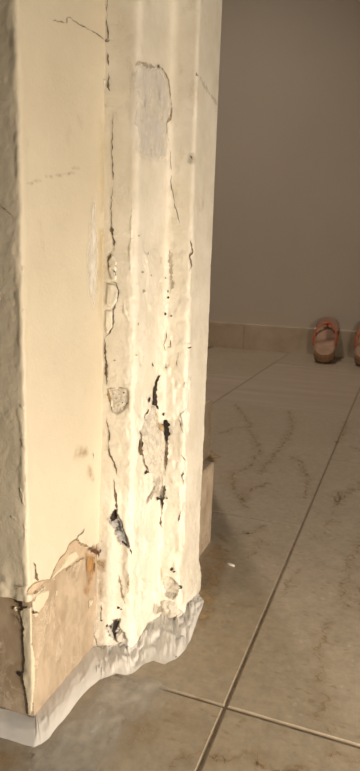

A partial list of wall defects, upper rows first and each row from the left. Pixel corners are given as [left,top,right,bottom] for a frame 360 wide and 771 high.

crack [55,0,110,91]
crack [104,121,119,500]
crack [164,241,193,364]
spalling [108,388,129,414]
spalling [139,375,170,527]
spalling [109,493,132,555]
peeling [13,528,94,610]
spalling [100,607,128,649]
spalling [157,567,183,619]